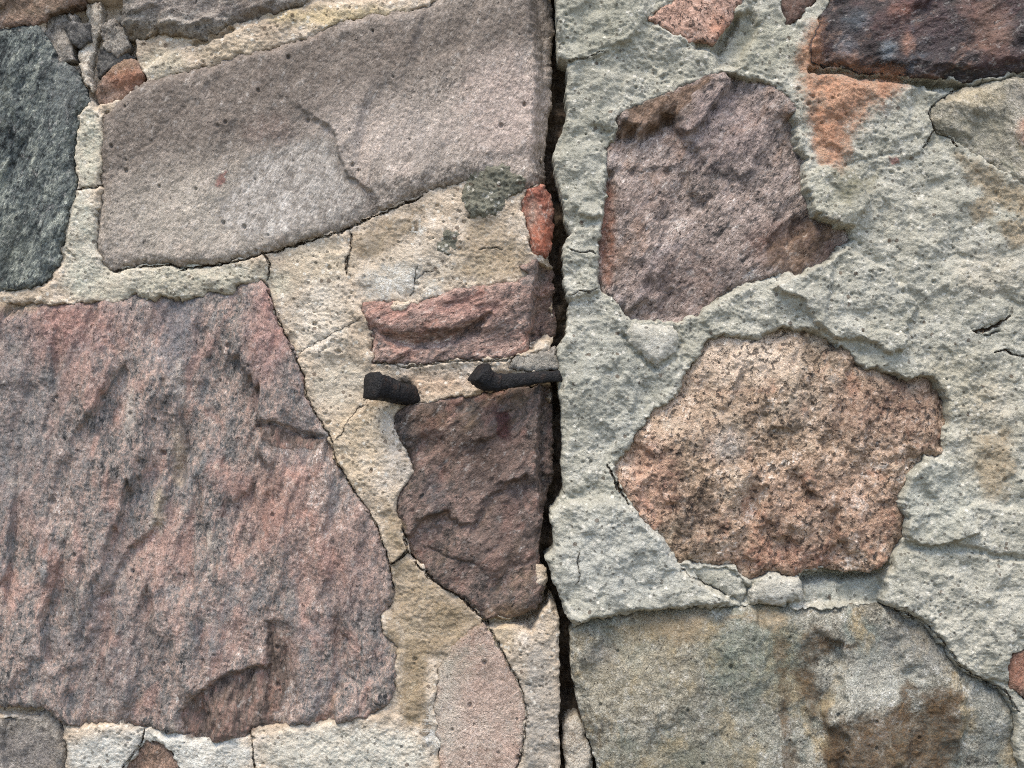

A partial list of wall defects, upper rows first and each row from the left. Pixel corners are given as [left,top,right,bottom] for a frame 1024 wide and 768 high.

crack [539,0,600,768]